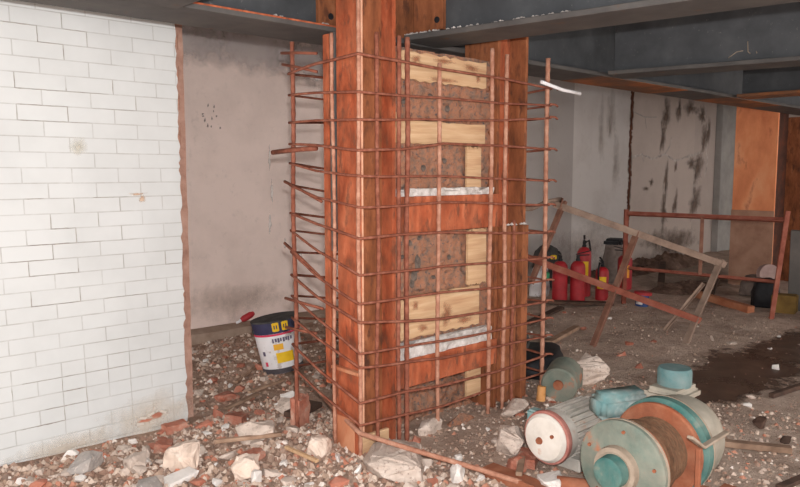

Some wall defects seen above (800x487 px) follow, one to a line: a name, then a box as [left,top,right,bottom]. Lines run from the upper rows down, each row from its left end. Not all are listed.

leakage [660,102,710,149]
leakage [662,164,677,223]
spalling [137,410,167,426]